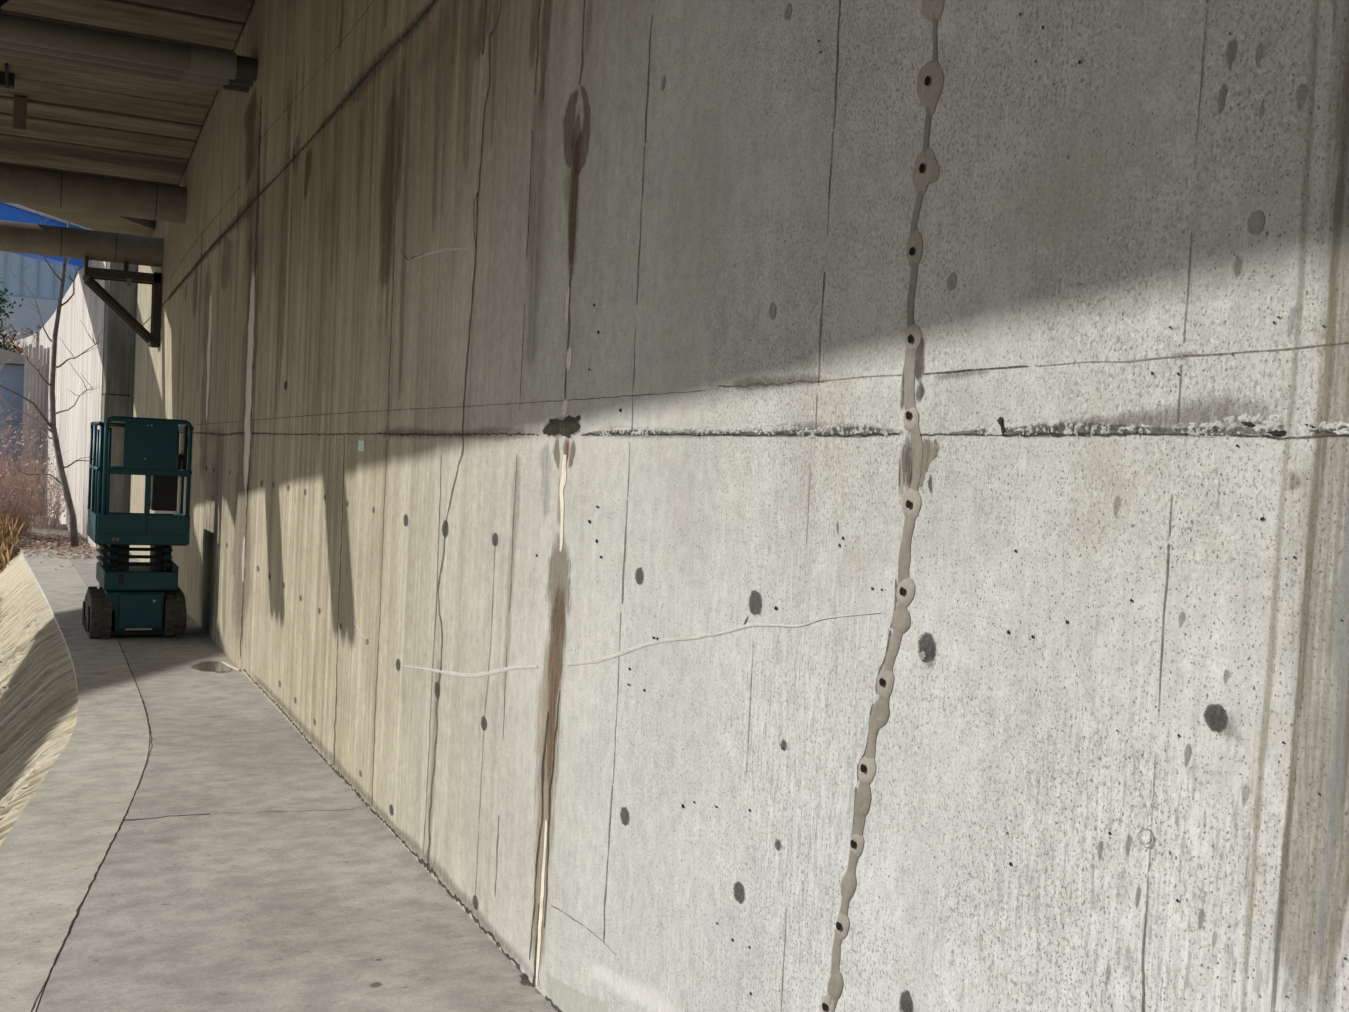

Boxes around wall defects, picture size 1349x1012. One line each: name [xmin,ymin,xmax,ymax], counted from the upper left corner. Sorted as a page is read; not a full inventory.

crack [144,0,538,862]
spalling [543,415,580,438]
crack [529,0,1349,1012]
spalling [970,417,1154,438]
spalling [1172,413,1349,447]
damp [1261,539,1279,754]
damp [1271,646,1326,1007]
damp [1322,60,1349,466]